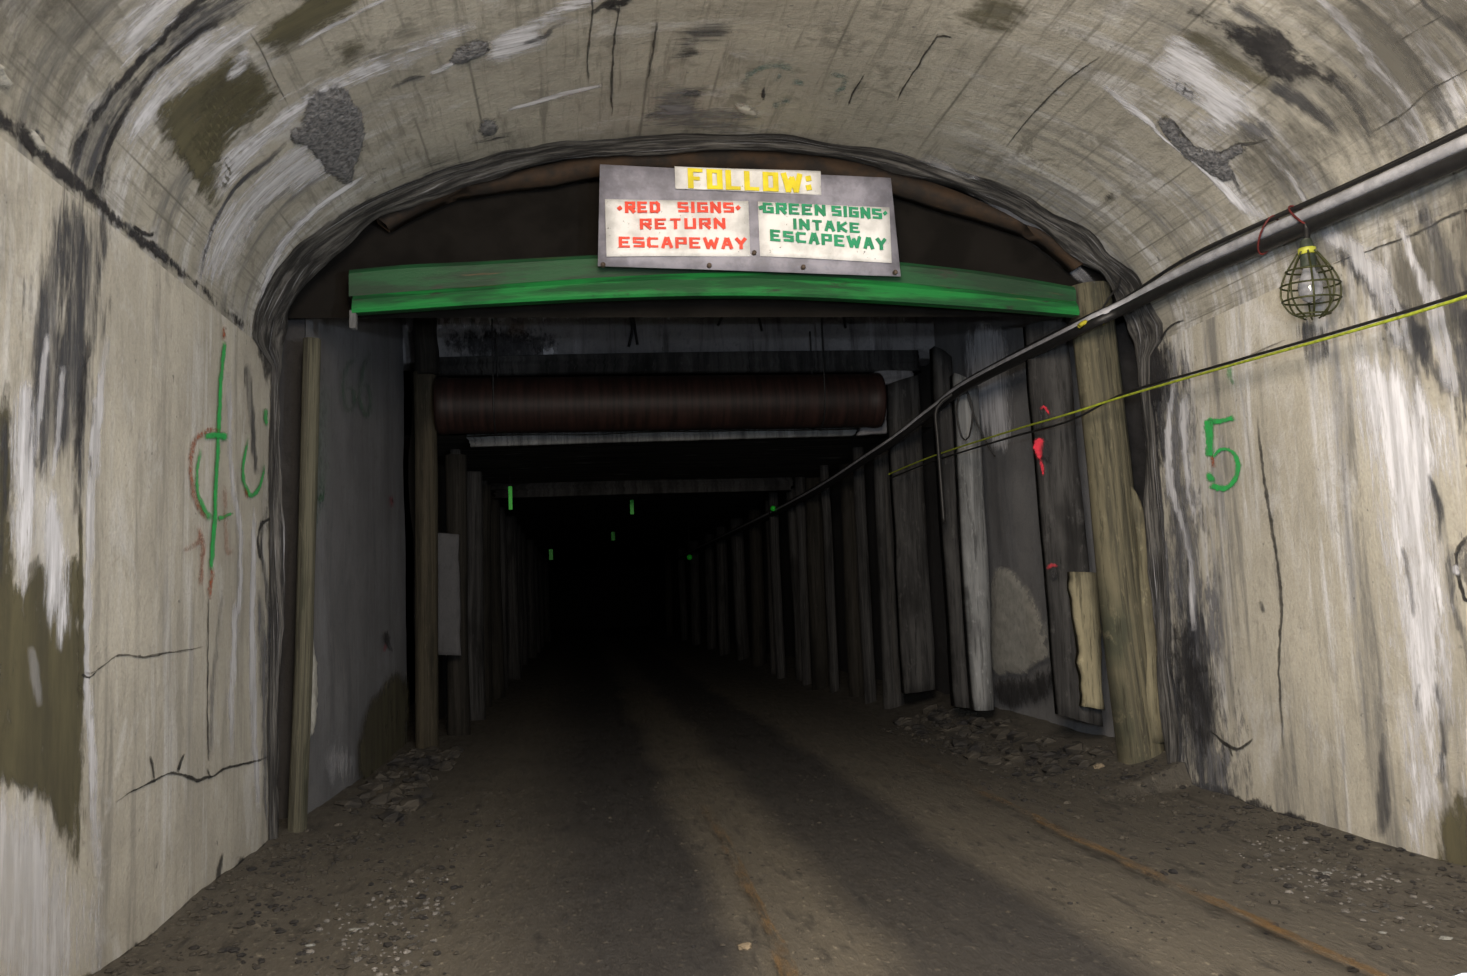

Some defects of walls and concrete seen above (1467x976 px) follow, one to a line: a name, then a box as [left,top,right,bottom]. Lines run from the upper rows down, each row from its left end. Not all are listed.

damp [1228,7,1266,33]
damp [74,0,466,279]
spalling [290,86,366,184]
damp [1114,94,1254,213]
damp [1158,33,1333,201]
damp [261,179,359,298]
damp [89,378,103,458]
damp [1330,232,1467,867]
damp [0,341,97,976]
crack [82,606,262,797]